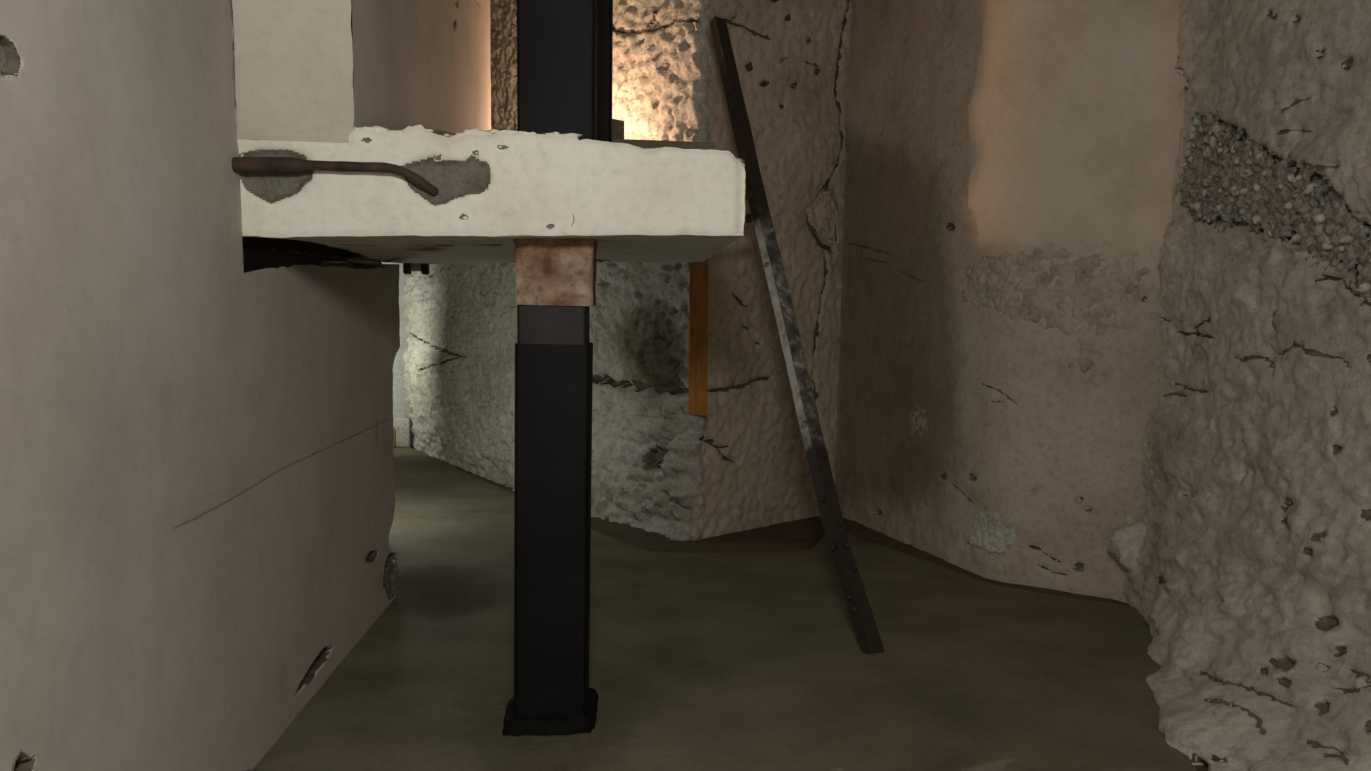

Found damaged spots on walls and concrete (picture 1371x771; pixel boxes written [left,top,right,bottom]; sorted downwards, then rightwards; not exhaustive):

crack [613,0,850,199]
spalling [239,149,313,204]
spalling [401,145,509,220]
spalling [1175,110,1371,306]
crack [593,293,770,395]
crack [811,243,921,416]
spalling [297,647,332,692]